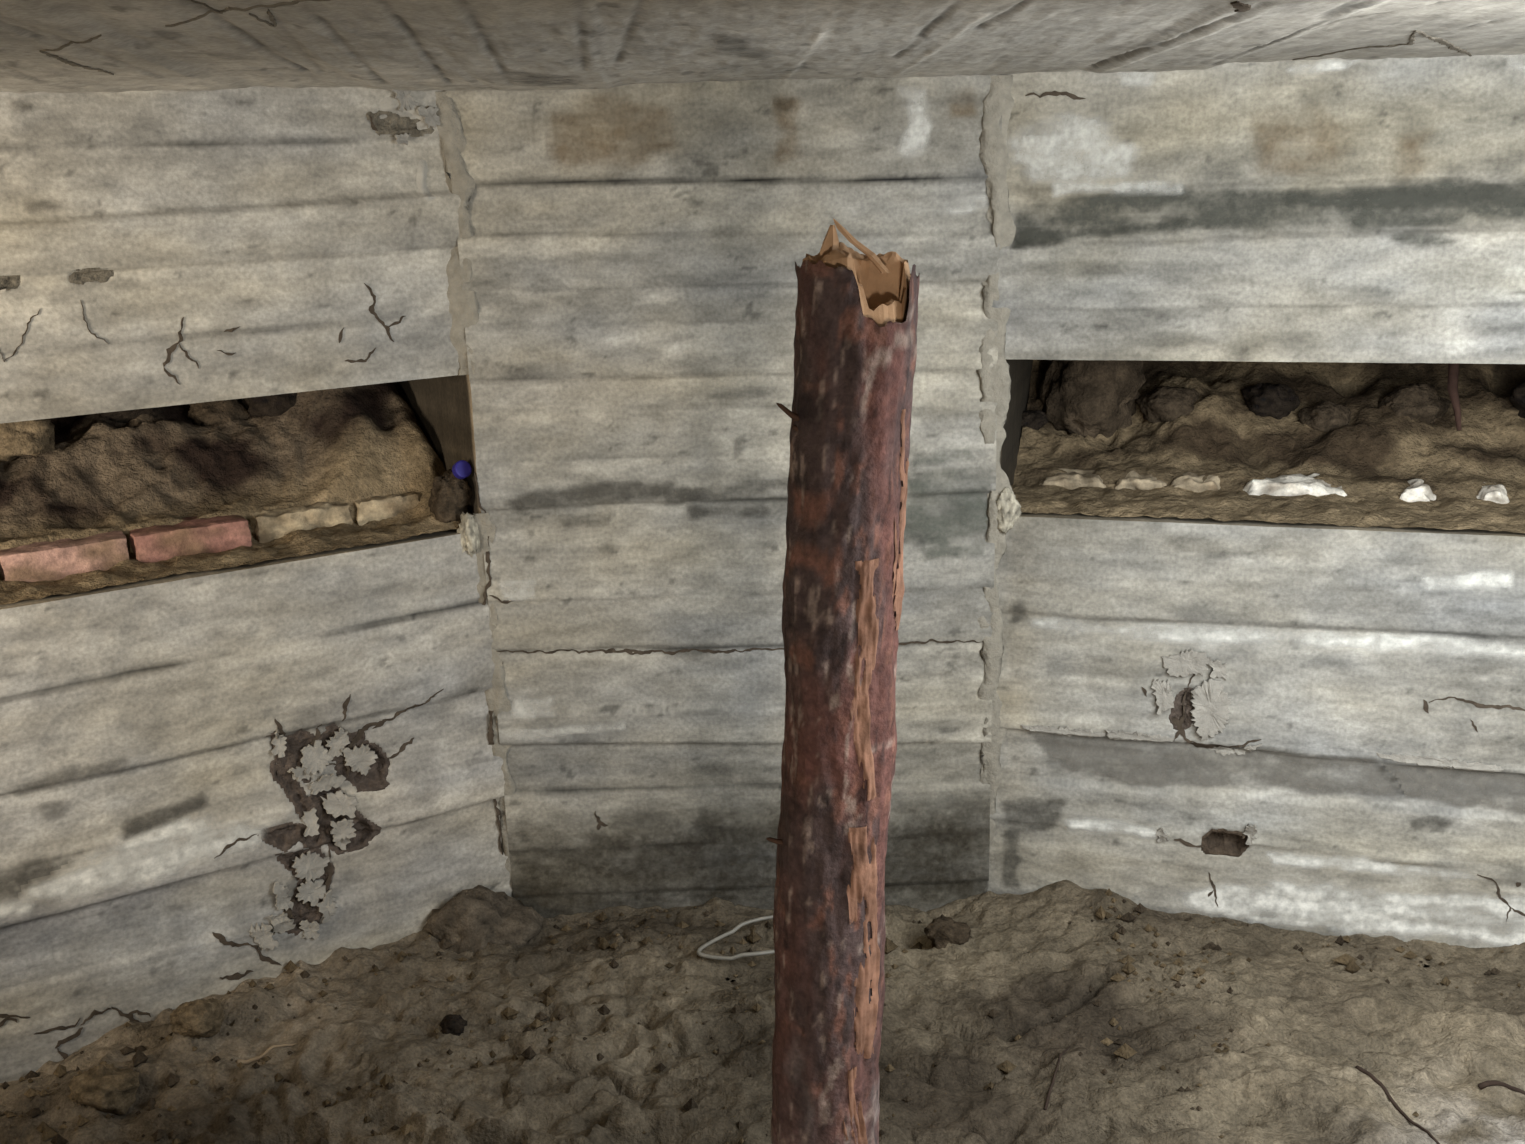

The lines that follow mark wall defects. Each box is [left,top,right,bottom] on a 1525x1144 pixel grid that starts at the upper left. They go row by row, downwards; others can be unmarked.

crack [165,0,330,27]
crack [39,34,114,75]
crack [1292,30,1472,61]
spalling [366,89,441,145]
water stain [1013,120,1525,248]
crack [163,317,239,384]
crack [339,283,405,363]
peeling [1021,649,1525,812]
crack [1423,696,1525,732]
spalling [214,689,443,951]
spalling [1156,823,1257,857]
crack [0,1006,151,1059]